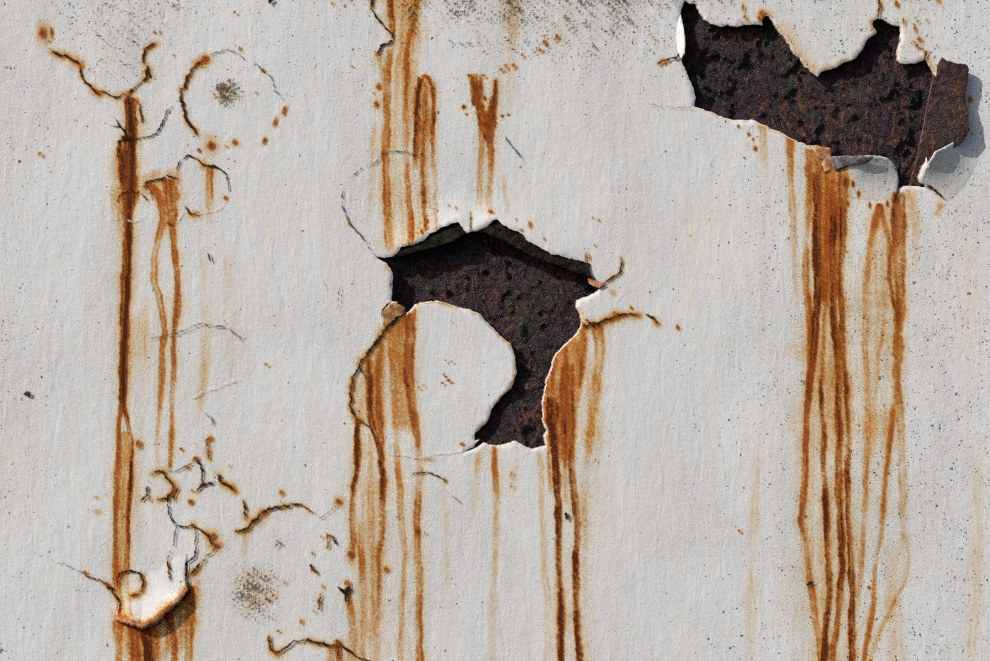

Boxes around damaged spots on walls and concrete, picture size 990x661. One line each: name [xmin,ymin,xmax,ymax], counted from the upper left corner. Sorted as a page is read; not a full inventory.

crack [63,563,145,611]
corrosion [113,98,140,580]
crack [39,27,286,225]
crack [141,418,371,661]
corrosion [351,346,398,501]
crack [341,150,420,253]
peeling [378,220,604,450]
corrosion [462,54,523,159]
corrosion [544,333,585,661]
crack [603,257,623,284]
peeling [676,2,970,188]
corrosion [797,160,874,661]